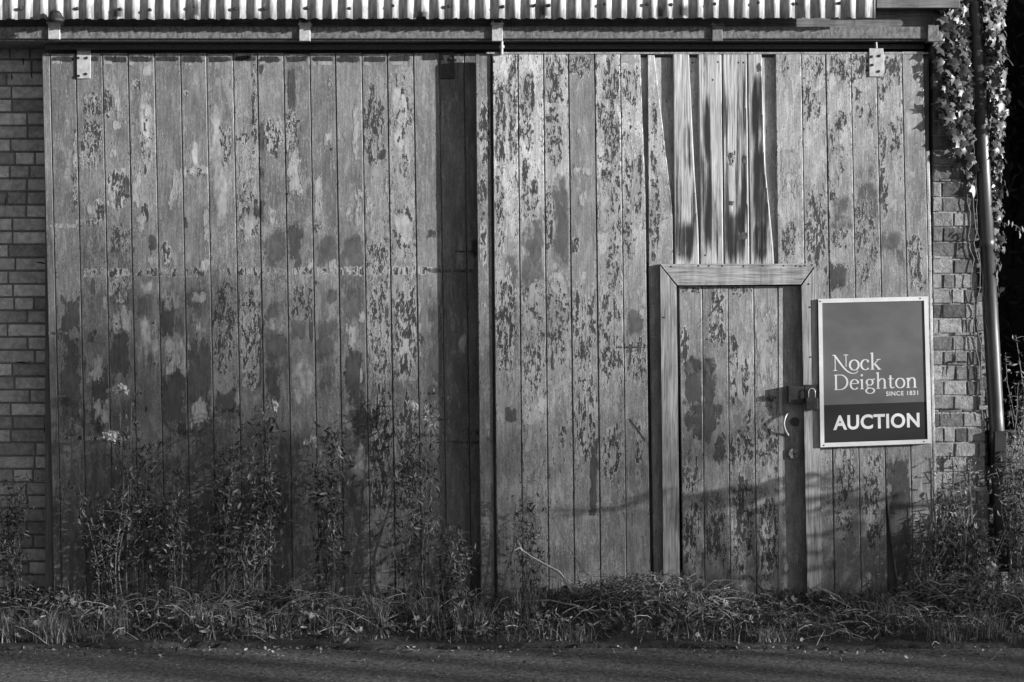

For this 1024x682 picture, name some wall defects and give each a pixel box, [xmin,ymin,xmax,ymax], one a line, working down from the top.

peeling [69,88,113,212]
peeling [90,275,131,305]
peeling [93,167,151,253]
peeling [140,118,153,175]
peeling [210,271,261,391]
peeling [184,59,302,251]
peeling [290,269,319,322]
peeling [427,54,669,487]
peeling [779,54,902,298]
peeling [907,231,927,290]
peeling [680,286,784,582]